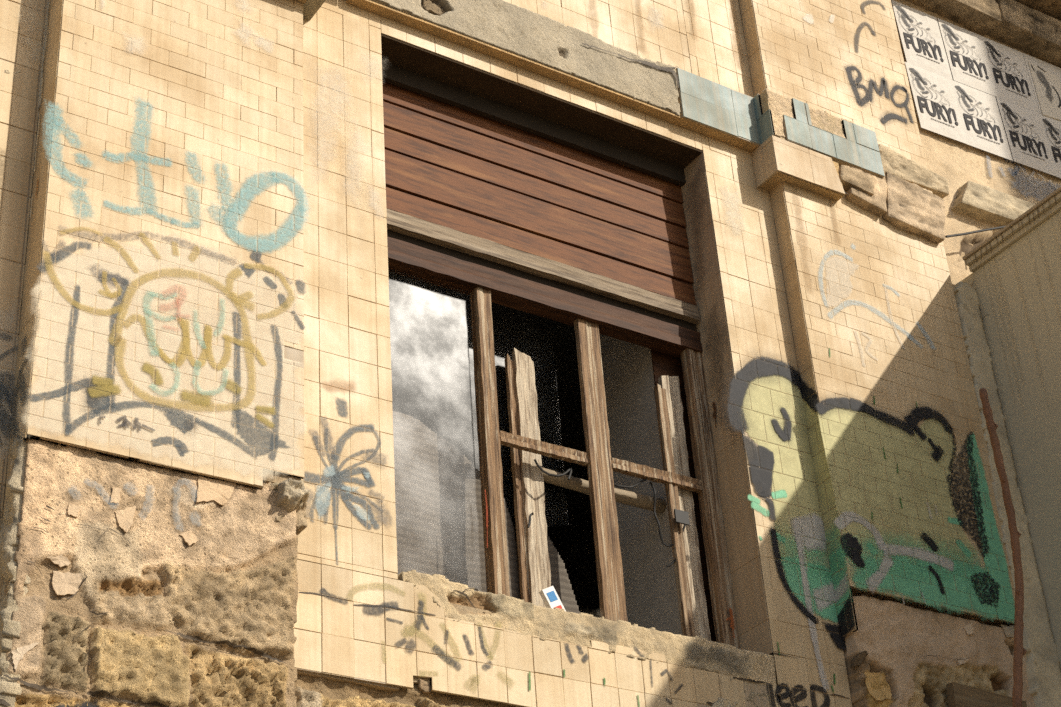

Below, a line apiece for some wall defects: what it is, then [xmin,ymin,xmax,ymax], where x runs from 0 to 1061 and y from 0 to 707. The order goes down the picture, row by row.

spalling [422,0,445,16]
flaking render [196,476,236,506]
flaking render [109,487,136,533]
flaking render [180,530,198,546]
flaking render [46,554,84,596]
flaking render [11,642,39,671]
flaking render [850,651,892,701]